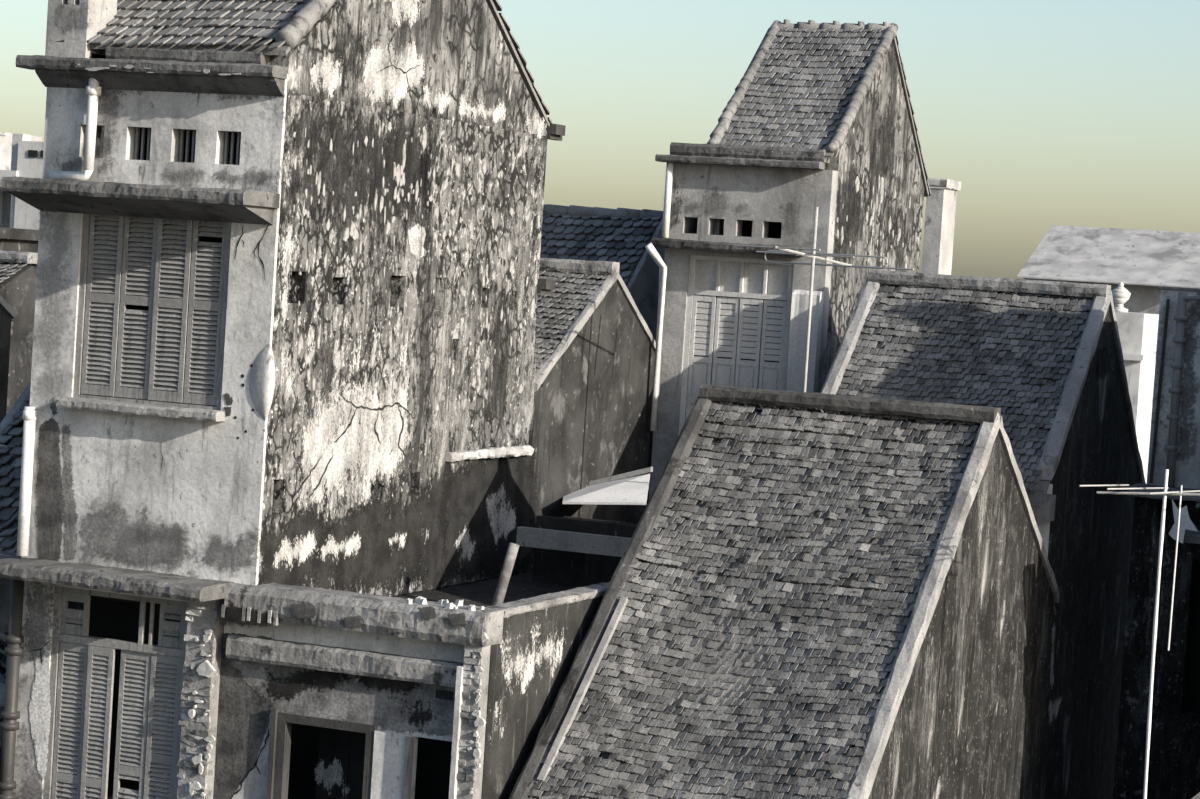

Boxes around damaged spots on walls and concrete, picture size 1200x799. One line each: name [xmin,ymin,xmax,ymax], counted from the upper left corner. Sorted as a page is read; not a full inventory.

water stain [79,0,542,593]
peeling [276,0,547,514]
crack [293,394,415,499]
peeling [273,531,361,570]
peeling [388,531,407,551]
peeling [455,525,476,568]
peeling [486,482,516,549]
spalling [417,606,468,629]
spalling [188,602,455,799]
peeling [467,616,564,773]